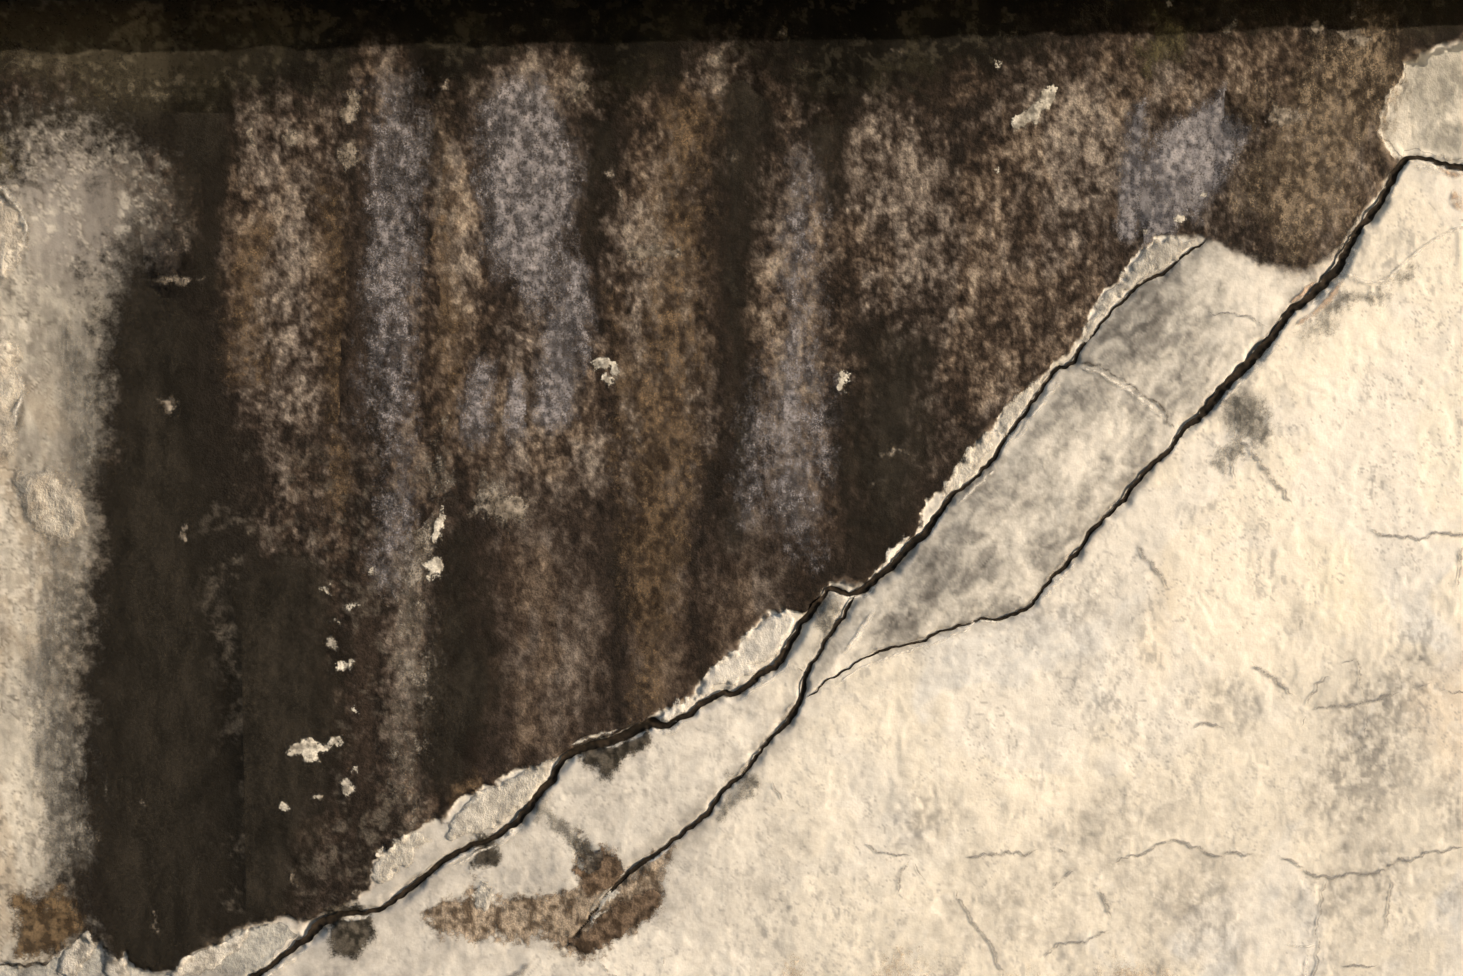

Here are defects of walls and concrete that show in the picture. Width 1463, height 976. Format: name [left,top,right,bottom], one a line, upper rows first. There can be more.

leakage [1302,265,1414,338]
flaking render [943,379,1042,499]
leakage [1212,389,1272,469]
crack [250,155,1463,976]
flaking render [657,609,794,722]
leakage [36,709,84,862]
peeling [287,736,343,762]
flaking render [371,759,555,884]
leakage [469,833,502,869]
spalling [423,829,676,964]
leakage [579,729,651,781]
crack [1,947,65,968]